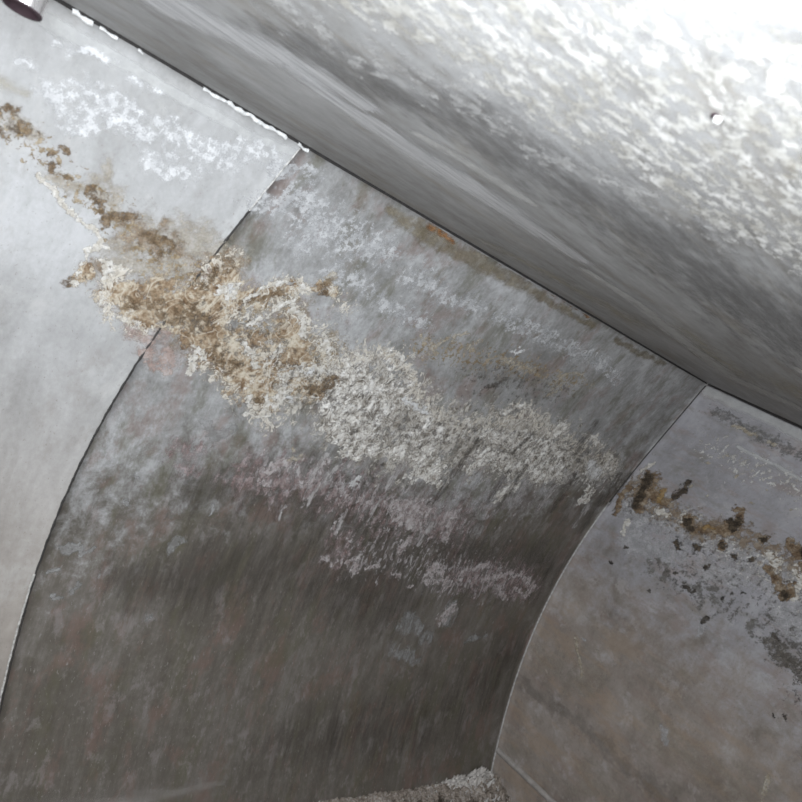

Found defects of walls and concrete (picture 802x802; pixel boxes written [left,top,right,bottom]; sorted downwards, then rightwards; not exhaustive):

efflorescence [51,39,110,63]
efflorescence [2,78,630,664]